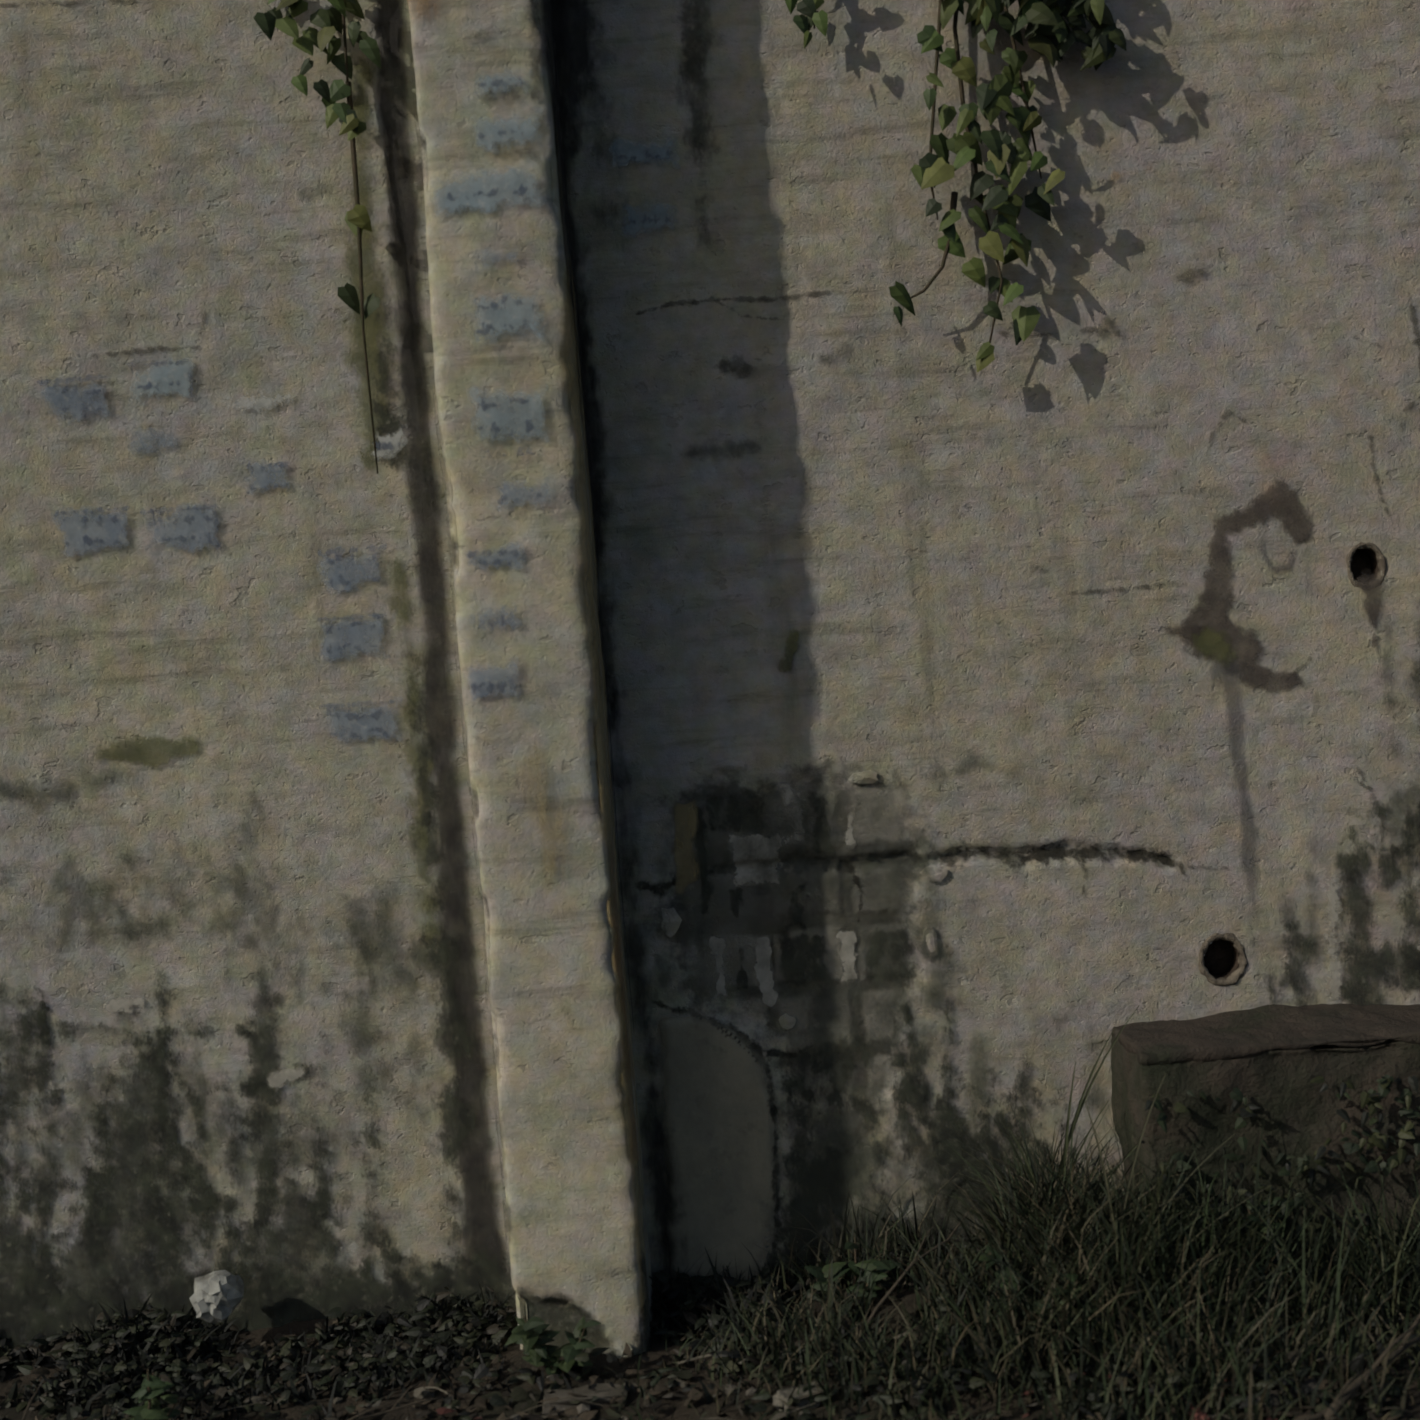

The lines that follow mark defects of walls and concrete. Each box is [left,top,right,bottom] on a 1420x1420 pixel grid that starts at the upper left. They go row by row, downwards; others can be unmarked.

leakage [0,0,524,1353]
leakage [1166,481,1311,691]
leakage [1357,575,1381,648]
crack [639,867,735,896]
flaking render [661,760,948,1192]
crack [846,818,1227,922]
leakage [1264,792,1420,1007]
leakage [763,988,1078,1288]